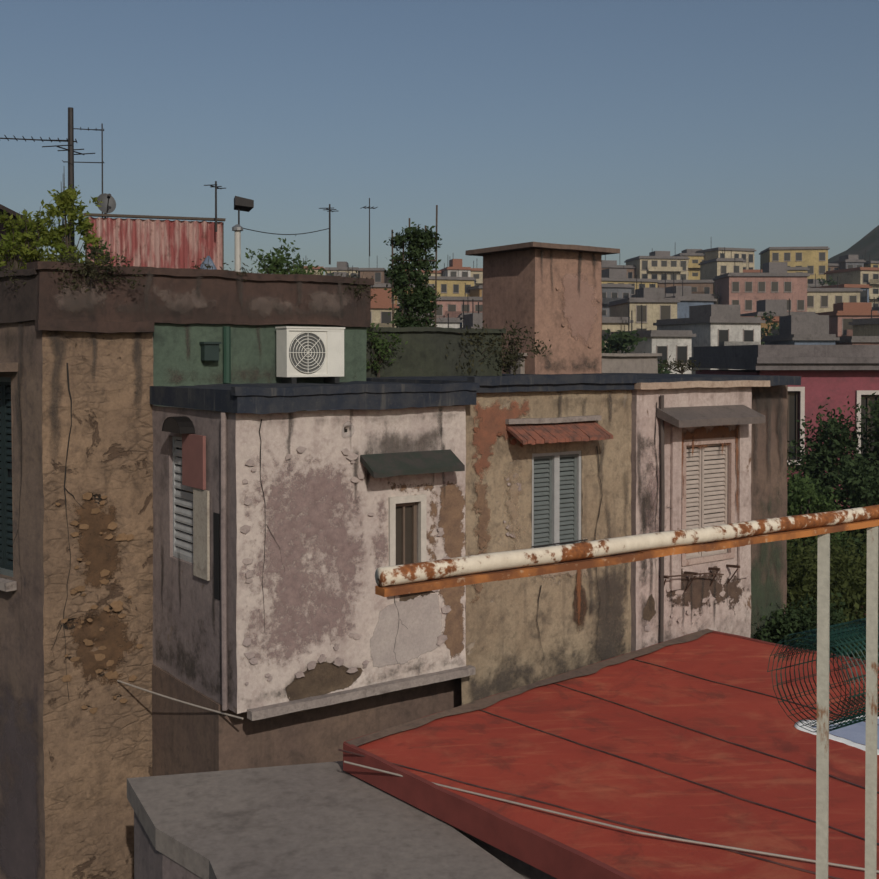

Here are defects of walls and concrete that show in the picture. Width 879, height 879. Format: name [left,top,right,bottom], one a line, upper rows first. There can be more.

crack [52,363,85,698]
crack [259,419,285,633]
peeling [240,446,388,701]
spalling [398,583,483,658]
flaking render [388,399,530,560]
corrosion [573,569,588,631]
spalling [666,566,749,623]